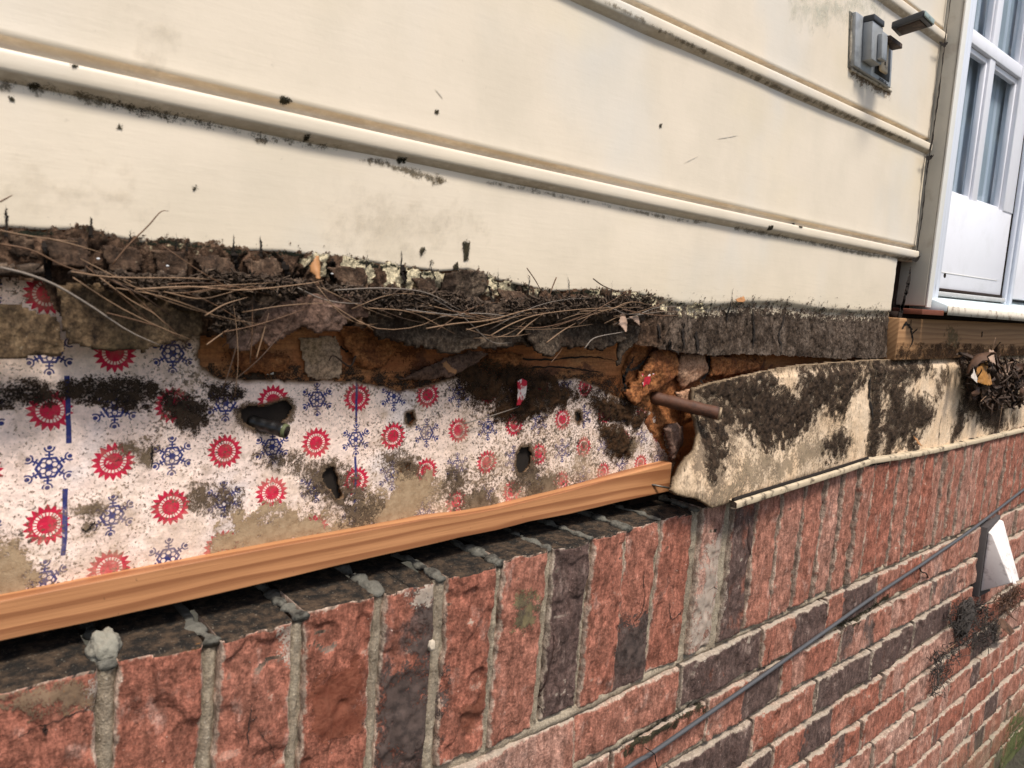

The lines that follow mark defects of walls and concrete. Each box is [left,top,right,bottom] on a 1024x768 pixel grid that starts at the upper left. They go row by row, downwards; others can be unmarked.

damp [0,79,60,97]
damp [74,90,328,149]
damp [359,158,446,186]
peeling [151,250,283,279]
peeling [411,269,488,298]
peeling [224,266,369,375]
damp [0,345,319,438]
damp [332,345,625,398]
damp [680,328,1024,505]
peeling [207,465,446,554]
peeling [457,485,502,510]
peeling [0,534,45,594]